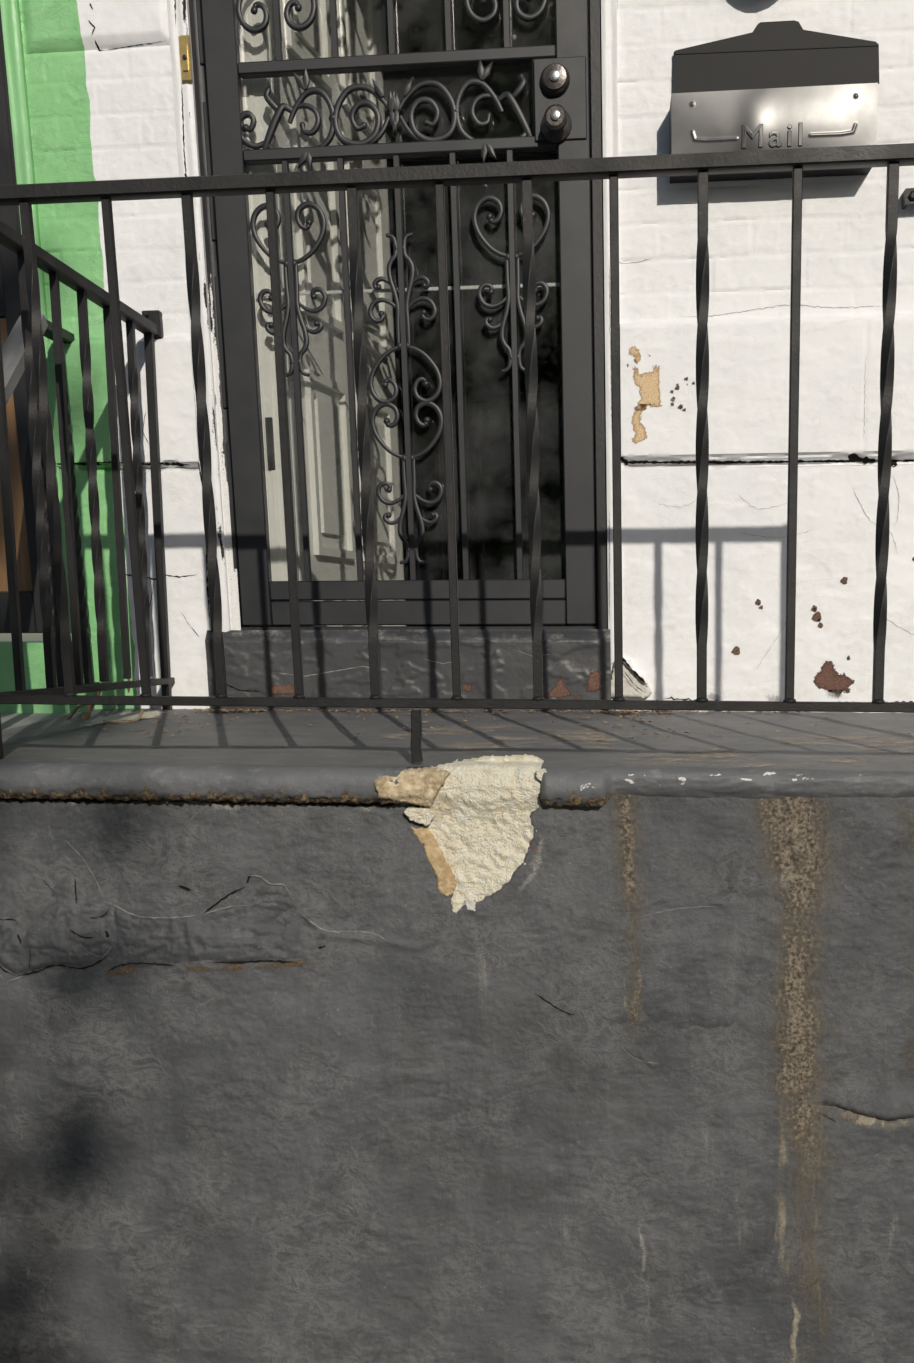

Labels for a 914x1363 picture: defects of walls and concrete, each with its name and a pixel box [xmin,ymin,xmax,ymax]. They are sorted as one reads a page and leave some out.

peeling [627,346,695,444]
peeling [640,748,776,781]
spalling [374,727,547,913]
crack [816,1104,912,1126]